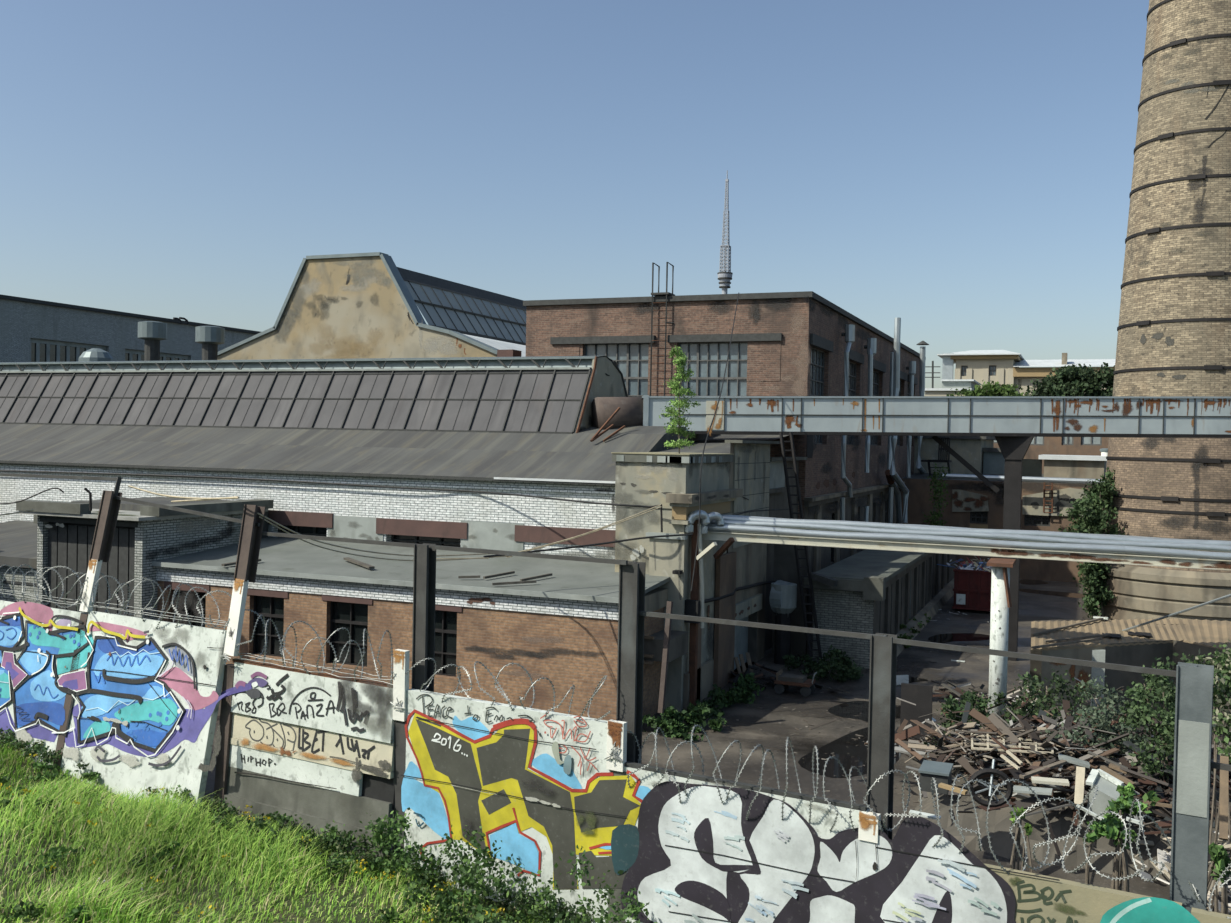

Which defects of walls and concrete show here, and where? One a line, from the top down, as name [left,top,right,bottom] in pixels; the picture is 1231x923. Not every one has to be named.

rust [707,399,802,434]
rust [843,399,880,432]
rust [1051,398,1231,433]